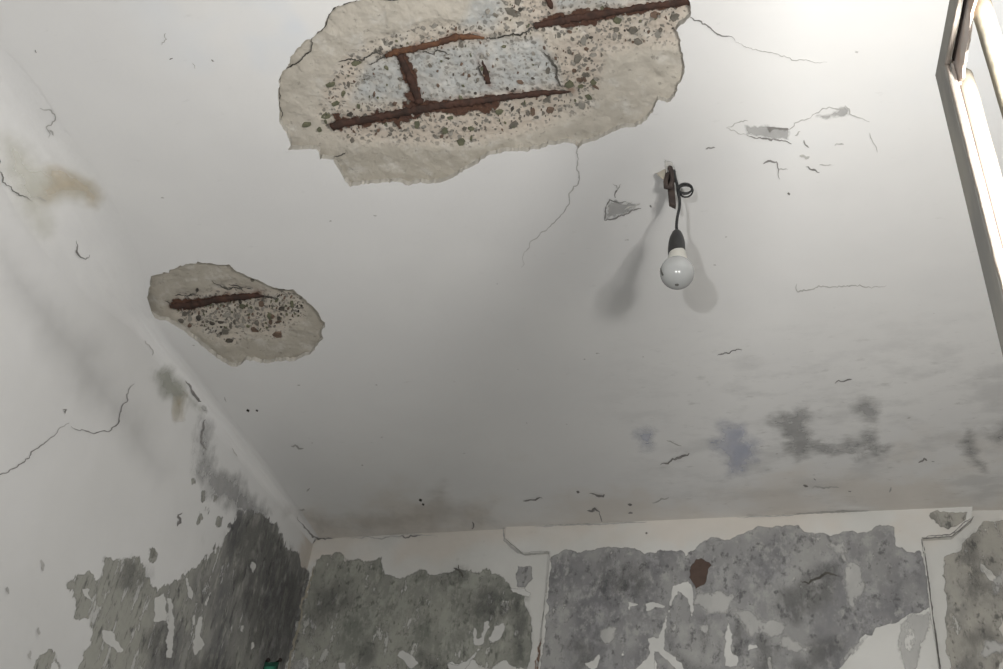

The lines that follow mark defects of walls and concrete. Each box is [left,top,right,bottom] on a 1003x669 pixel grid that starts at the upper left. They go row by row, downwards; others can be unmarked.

crack [690,17,822,63]
spalling [278,0,691,187]
crack [0,160,46,201]
crack [522,147,580,263]
spalling [147,262,325,367]
crack [0,384,134,475]
peeling [930,511,967,529]
peeling [67,478,929,669]
peeling [943,520,1003,669]
peeling [34,649,60,669]